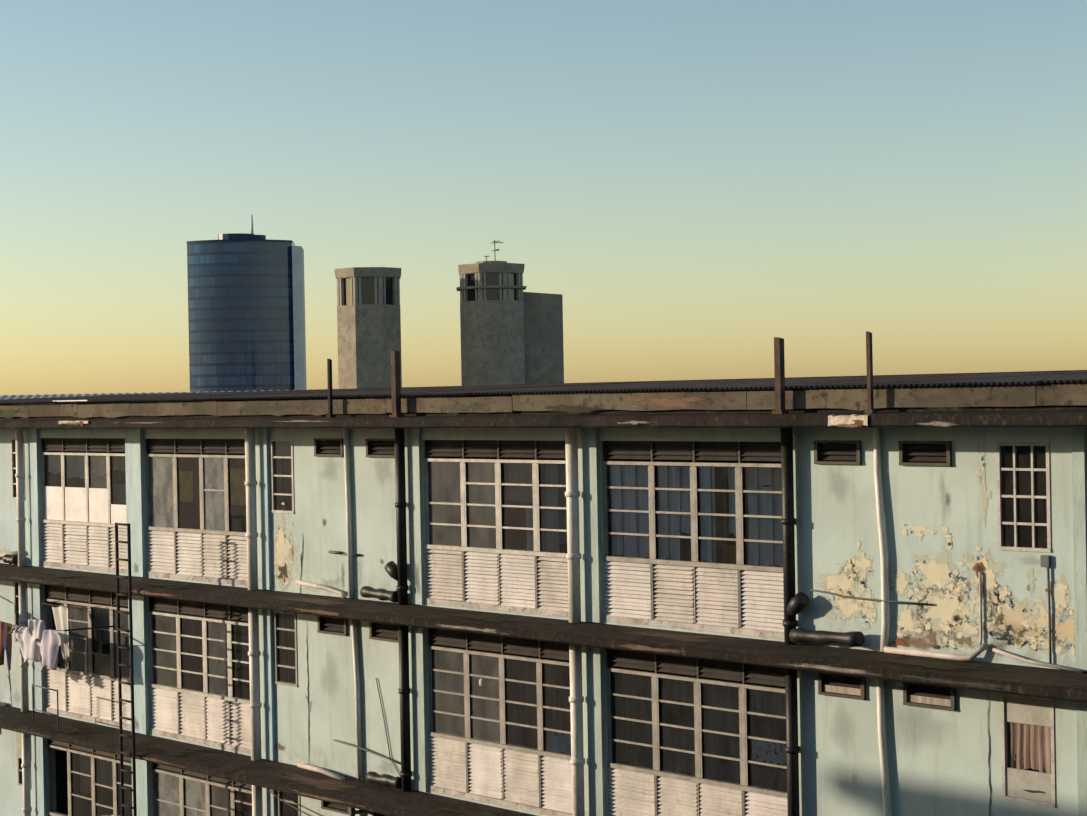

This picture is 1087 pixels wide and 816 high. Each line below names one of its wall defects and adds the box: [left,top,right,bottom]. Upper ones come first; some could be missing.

peeling [272,502,298,591]
peeling [818,540,878,629]
corrosion [973,562,985,596]
peeling [888,524,1075,659]
crack [985,696,993,816]